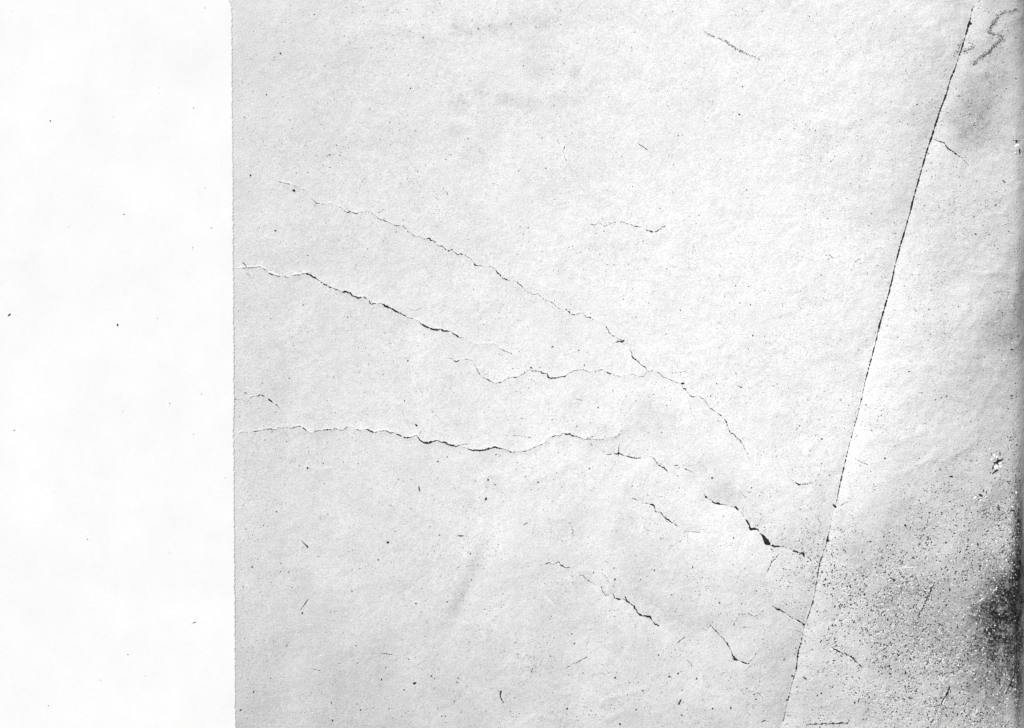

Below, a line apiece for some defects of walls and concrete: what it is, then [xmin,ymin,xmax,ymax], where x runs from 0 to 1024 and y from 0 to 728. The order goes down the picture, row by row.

crack [234,176,749,458]
crack [235,392,692,474]
crack [704,494,812,571]
crack [540,561,659,626]
crack [702,605,805,672]
crack [831,647,862,671]
crack [806,719,849,727]